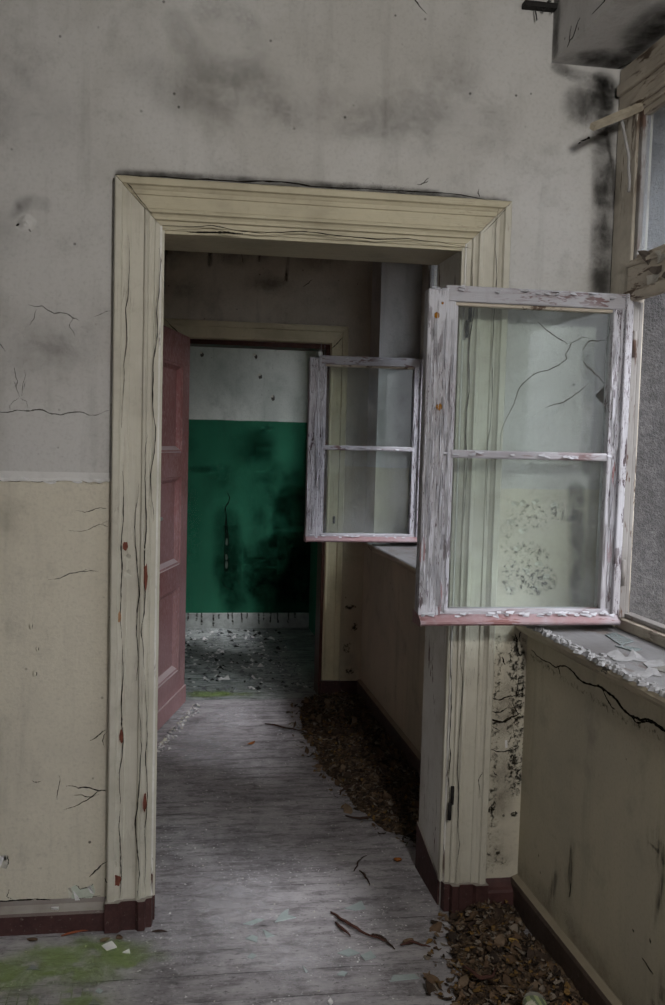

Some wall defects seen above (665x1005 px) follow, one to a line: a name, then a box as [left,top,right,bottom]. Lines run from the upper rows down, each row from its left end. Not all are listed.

leakage [579,77,616,148]
leakage [593,161,612,293]
crack [115,174,506,520]
crack [30,250,178,899]
leakage [187,487,310,626]
peeling [486,312,665,698]
leakage [488,636,554,827]
crack [448,626,665,860]